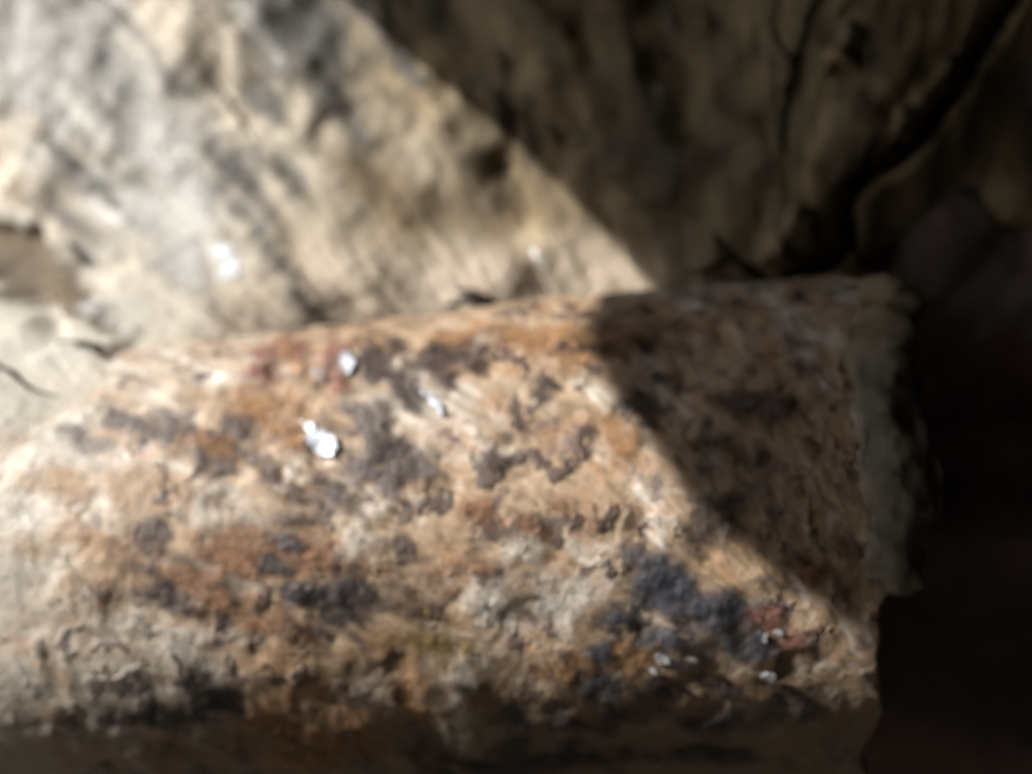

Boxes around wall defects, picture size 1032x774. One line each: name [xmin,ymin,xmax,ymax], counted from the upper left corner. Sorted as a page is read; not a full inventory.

crack [57,339,121,361]
crack [0,364,59,397]
corrosion [459,499,492,526]
corrosion [163,508,365,640]
corrosion [398,632,480,653]